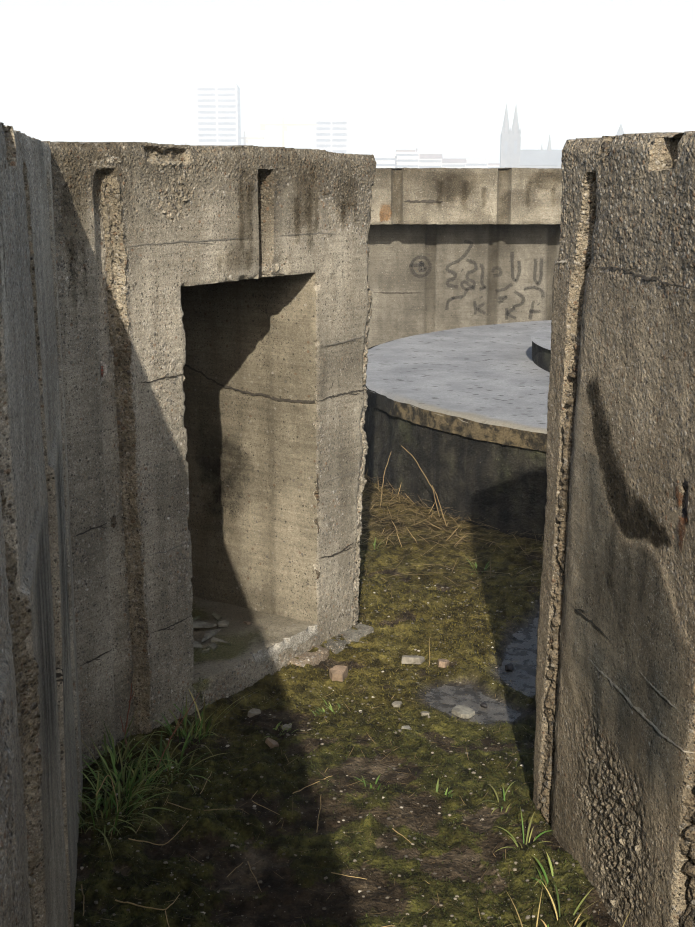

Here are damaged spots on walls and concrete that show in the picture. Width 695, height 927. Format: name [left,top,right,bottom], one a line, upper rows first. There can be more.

crack [590,266,689,289]
crack [142,364,366,403]
crack [321,543,353,558]
crack [564,596,610,642]
crack [587,657,695,753]